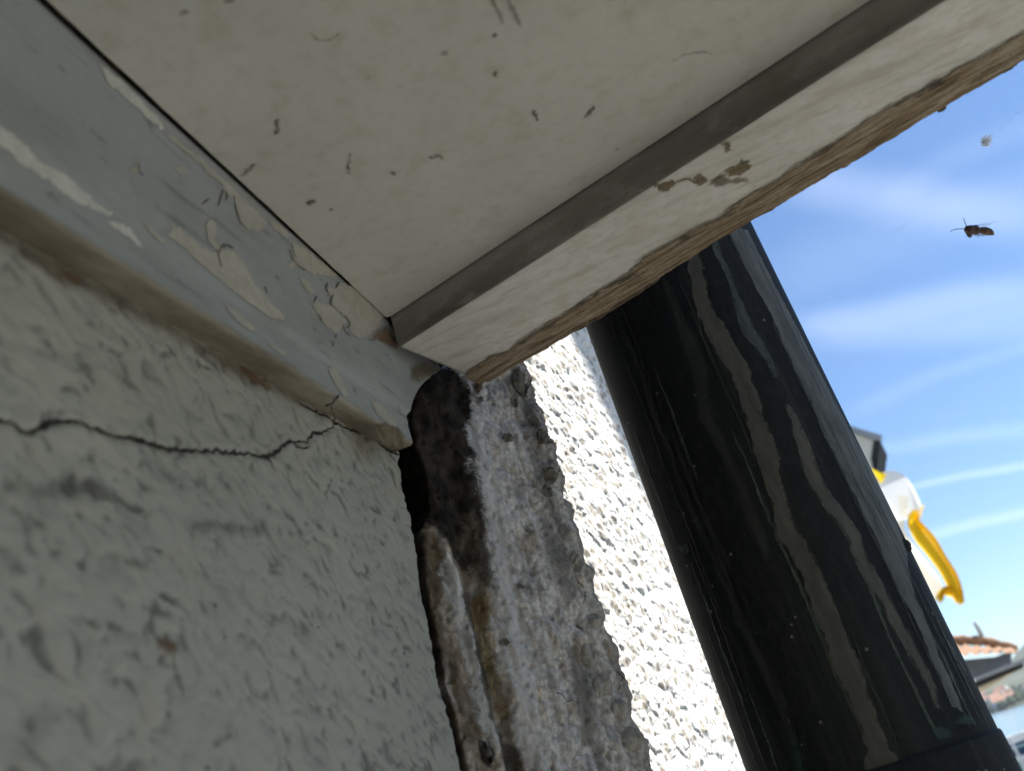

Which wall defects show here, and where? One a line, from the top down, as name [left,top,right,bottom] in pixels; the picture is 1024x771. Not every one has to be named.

peeling [0,125,143,249]
peeling [100,64,383,346]
peeling [464,33,1024,408]
crack [0,395,399,471]
spalling [530,416,554,444]
spalling [543,467,559,497]